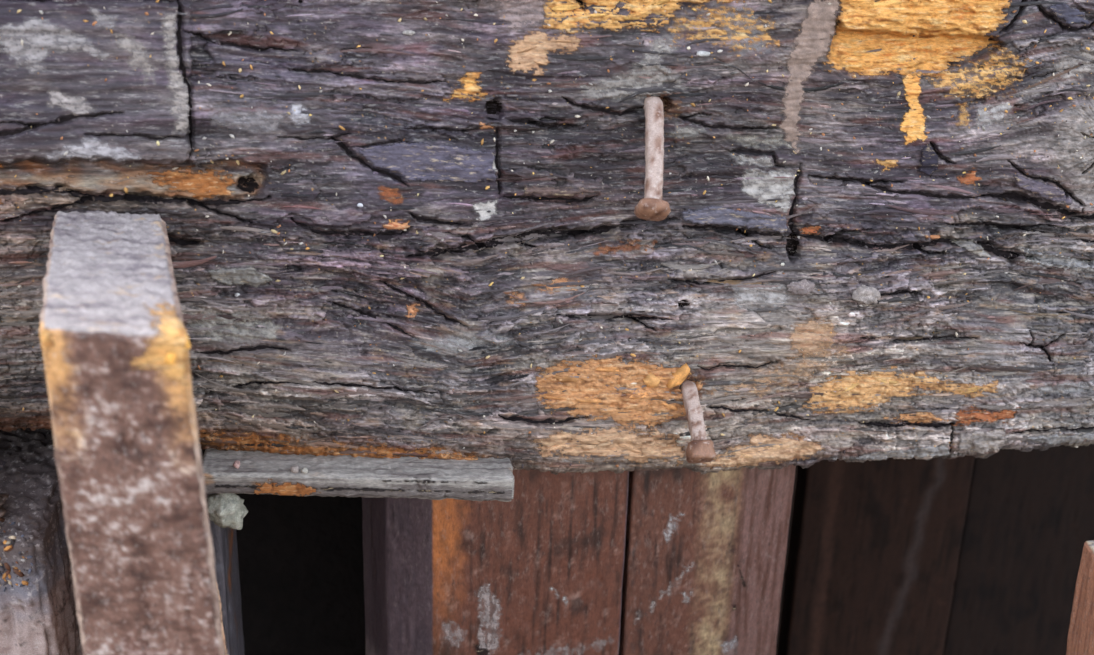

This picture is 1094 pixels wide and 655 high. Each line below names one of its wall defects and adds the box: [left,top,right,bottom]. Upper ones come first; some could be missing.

crack [0,0,445,158]
crack [279,97,636,203]
crack [0,185,269,222]
rust [135,165,236,200]
crack [292,113,1094,285]
crack [168,235,200,246]
crack [1019,332,1063,362]
rust [673,370,706,401]
rust [199,428,489,460]
rust [254,479,321,496]